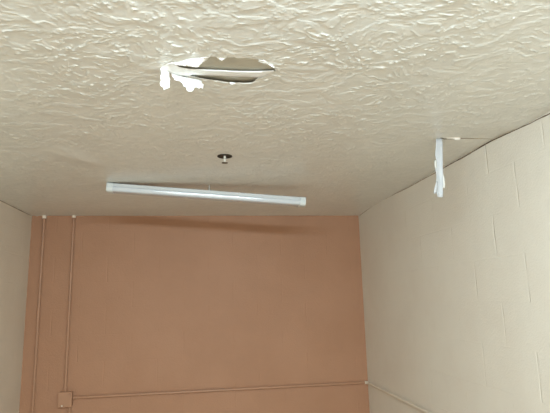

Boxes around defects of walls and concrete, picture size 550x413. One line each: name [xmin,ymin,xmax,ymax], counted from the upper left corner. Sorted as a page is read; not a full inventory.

peeling [138,56,329,92]
peeling [434,138,445,197]